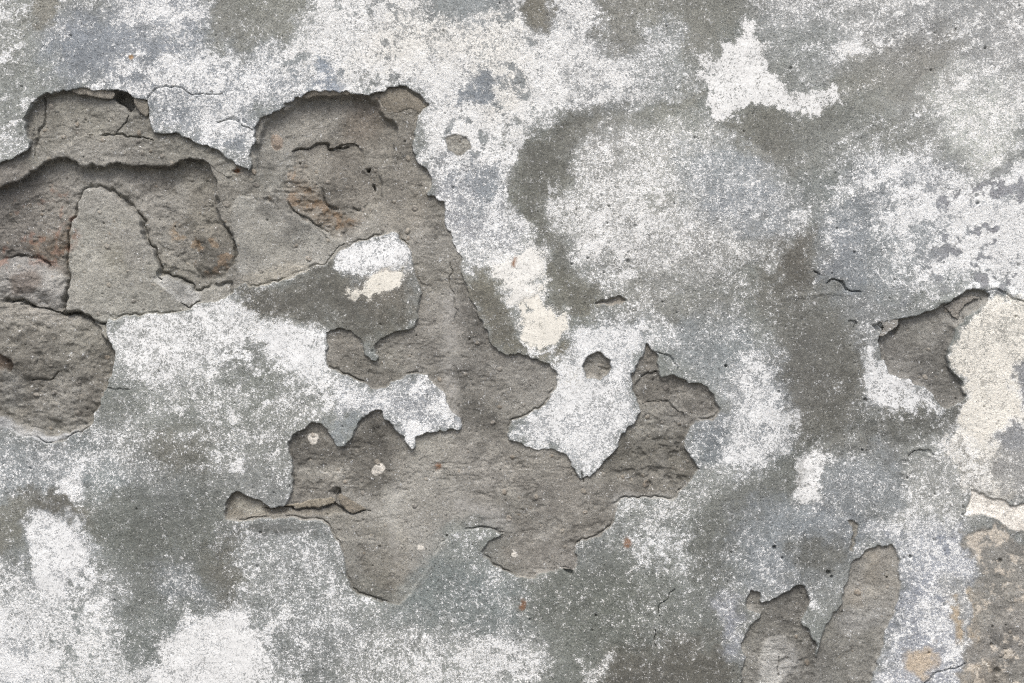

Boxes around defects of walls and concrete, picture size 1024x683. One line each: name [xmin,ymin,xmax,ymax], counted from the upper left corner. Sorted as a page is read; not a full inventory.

crack [291,142,360,152]
peeling [0,84,829,607]
flaking render [860,287,991,421]
flaking render [740,519,903,683]
peeling [963,488,1024,683]